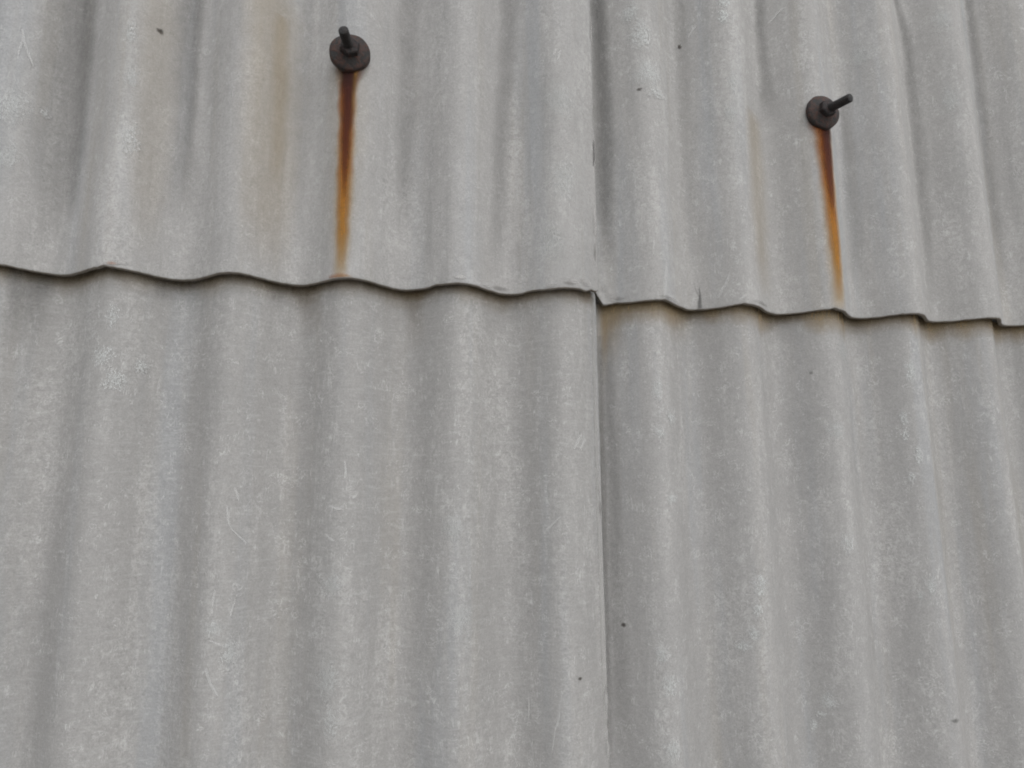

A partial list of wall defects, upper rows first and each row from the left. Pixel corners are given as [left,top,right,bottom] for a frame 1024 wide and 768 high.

corrosion [339,71,358,244]
corrosion [816,127,840,277]